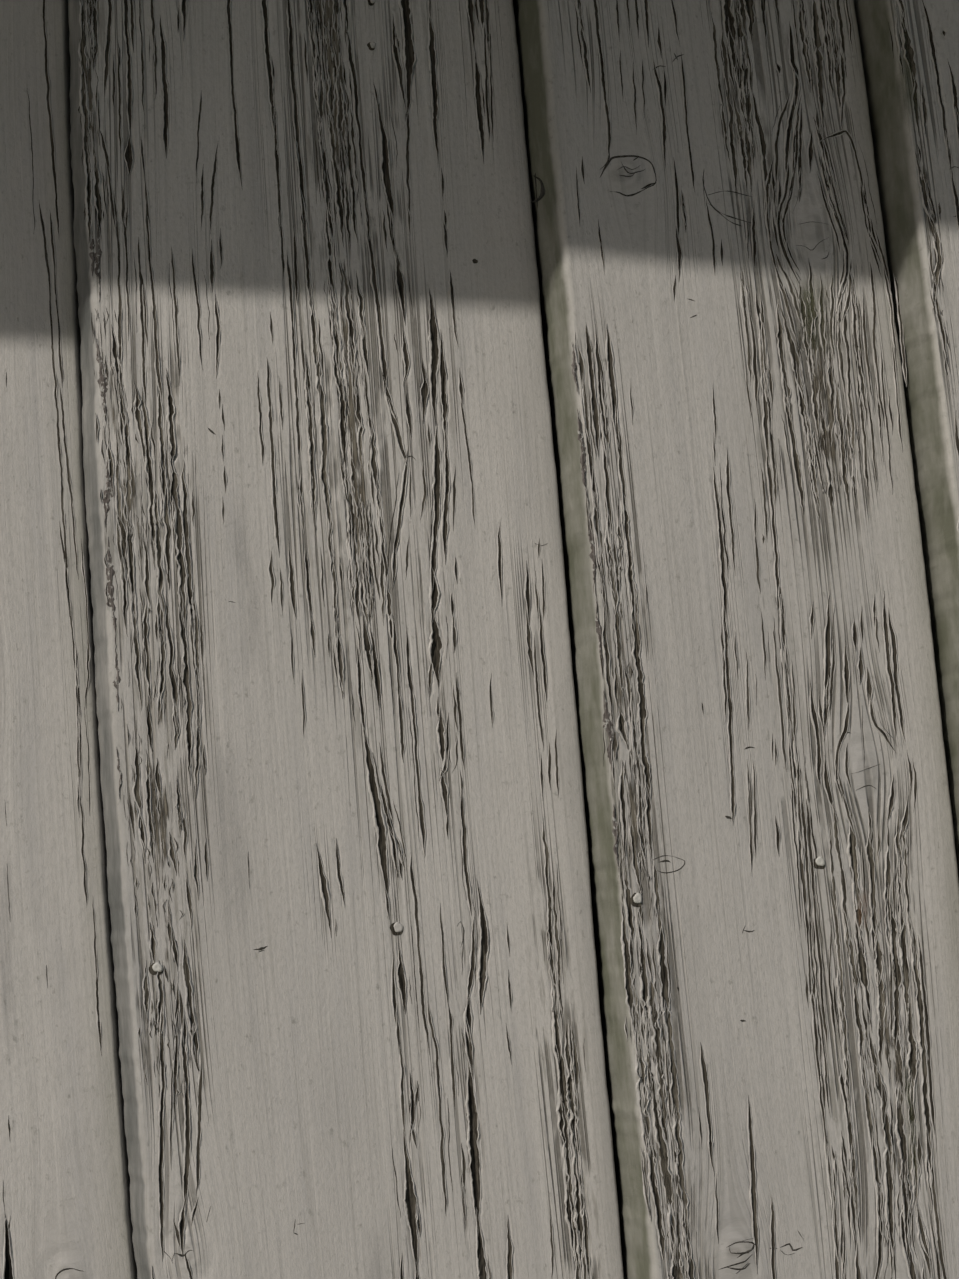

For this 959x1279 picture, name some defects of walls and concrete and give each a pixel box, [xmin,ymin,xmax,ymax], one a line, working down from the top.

crack [27,0,102,1056]
peeling [78,0,209,1098]
peeling [299,0,393,640]
peeling [741,252,869,523]
peeling [888,0,950,391]
crack [2,1196,15,1279]
peeling [541,818,594,1279]
peeling [577,409,700,1279]
peeling [829,801,936,1277]